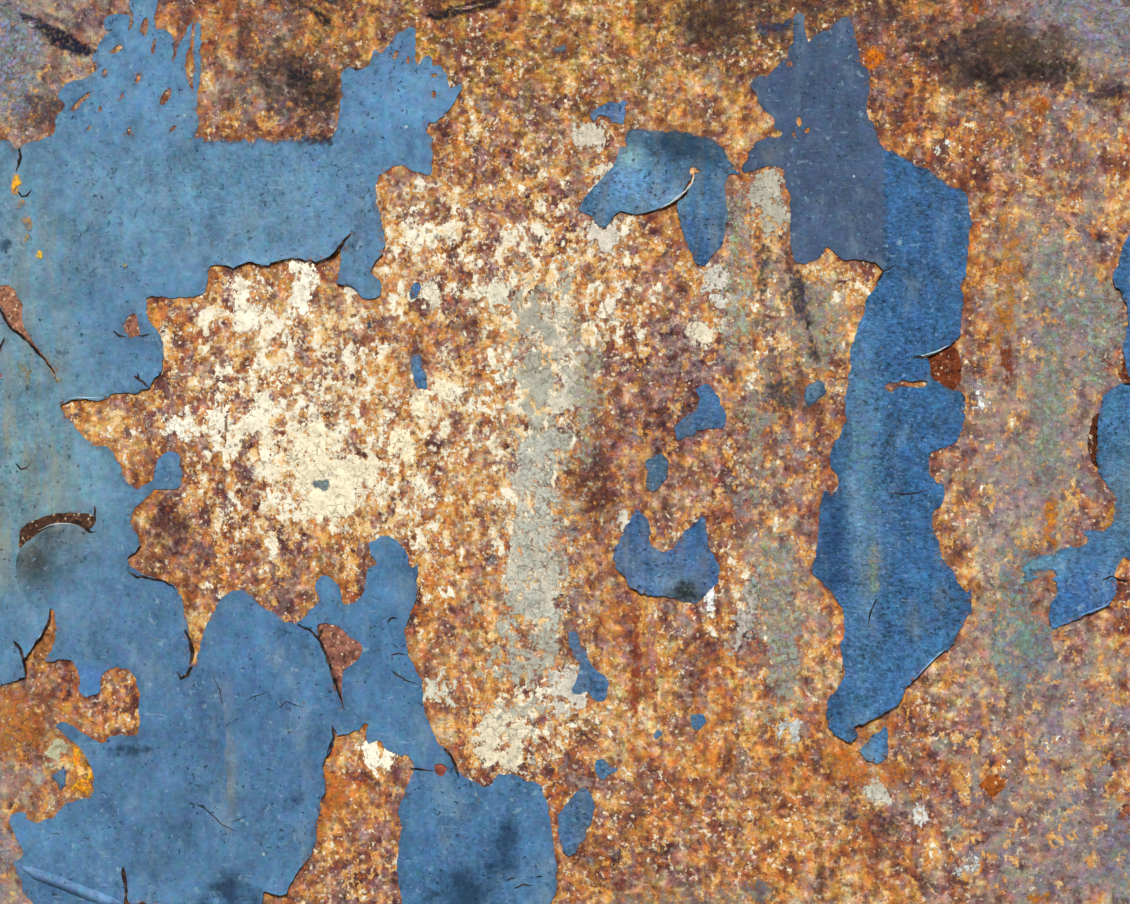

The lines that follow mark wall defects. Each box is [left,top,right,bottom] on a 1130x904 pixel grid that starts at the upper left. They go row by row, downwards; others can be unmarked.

rust [0,285,60,381]
peeling [578,13,972,764]
rust [926,345,961,390]
peeling [0,0,595,904]
peeling [1023,234,1130,629]
rust [1088,413,1099,467]
rust [19,513,95,548]
rust [33,609,57,661]
rust [317,623,363,706]
peeling [569,631,609,701]
rust [71,746,93,794]
peeling [595,759,618,780]